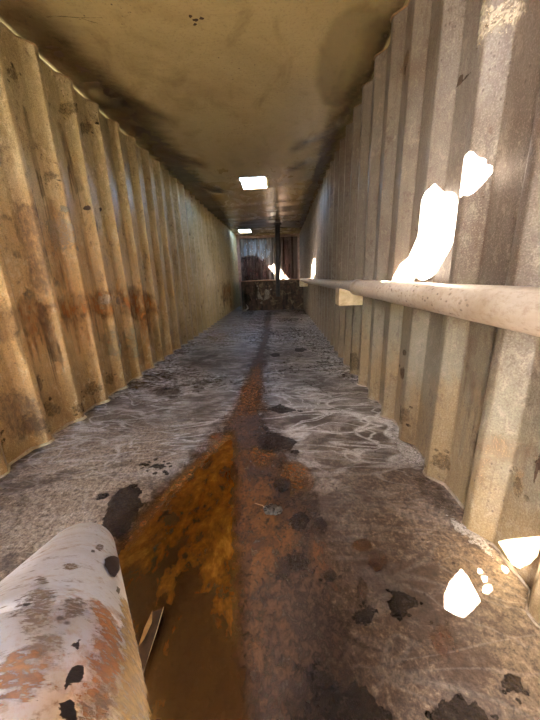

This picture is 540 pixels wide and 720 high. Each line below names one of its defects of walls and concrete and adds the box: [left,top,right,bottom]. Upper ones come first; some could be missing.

water stain [0,1,403,228]
rust [117,312,369,720]
water stain [391,434,450,469]